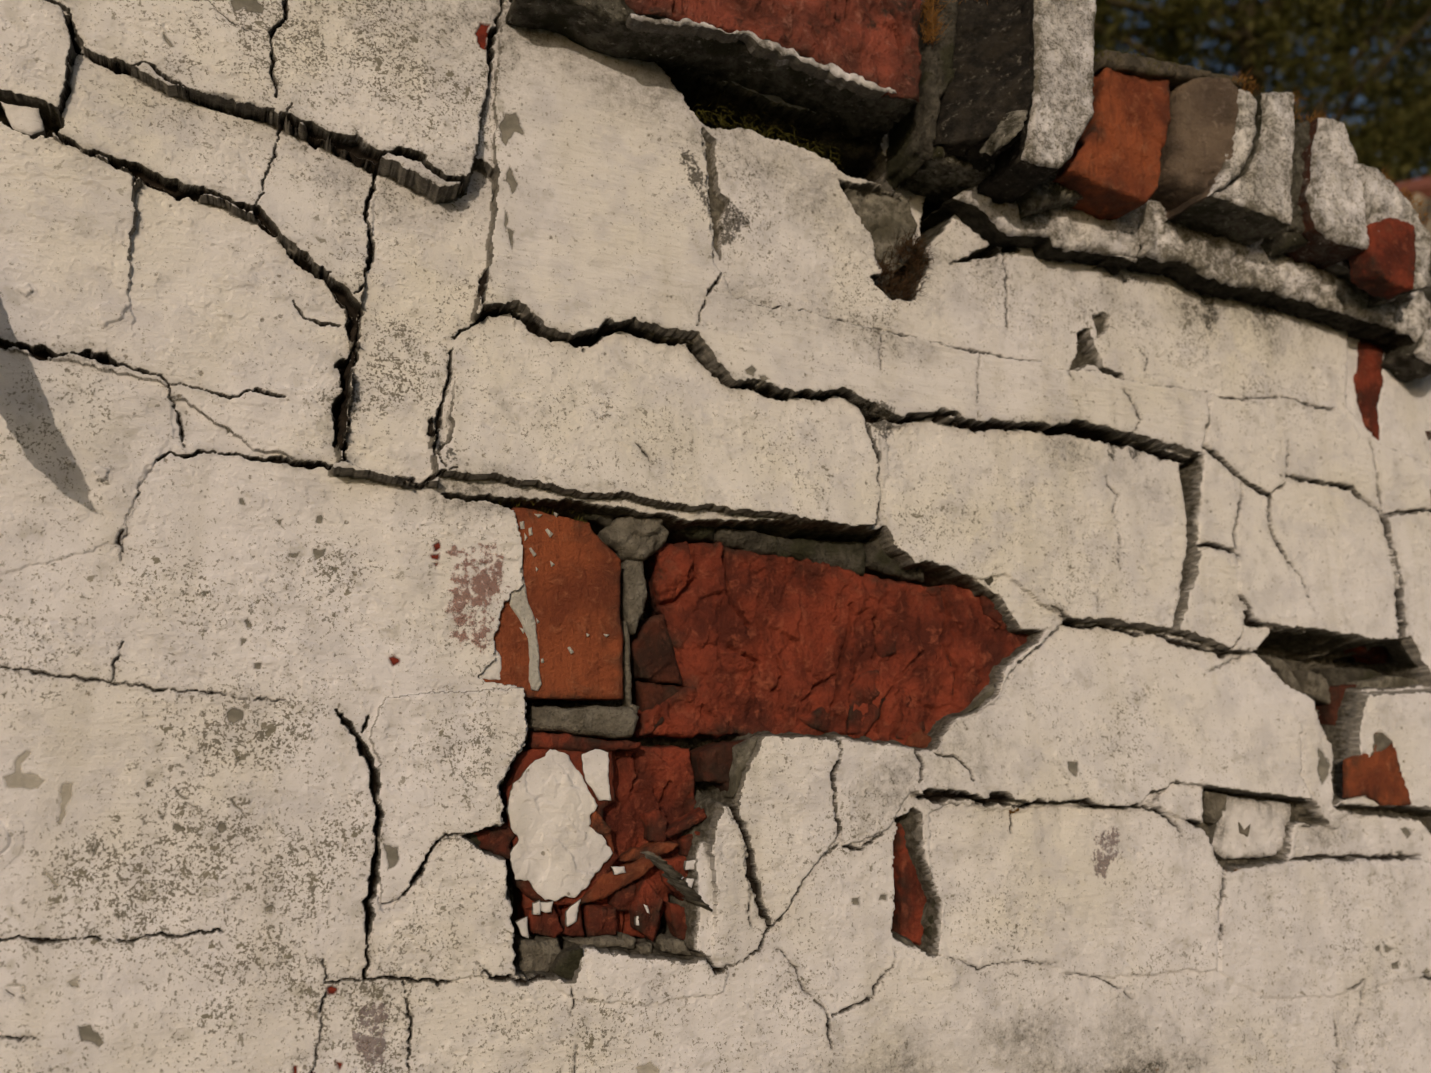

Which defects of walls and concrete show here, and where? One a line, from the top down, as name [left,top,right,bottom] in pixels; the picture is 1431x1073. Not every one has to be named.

spalling [1,102,46,140]
crack [0,0,1327,597]
spalling [1353,338,1384,440]
crack [1,642,276,702]
crack [1052,598,1258,668]
spalling [463,505,1028,980]
crack [914,753,1199,832]
spalling [1317,732,1411,806]
crack [0,928,220,942]
crack [311,711,449,1073]
crack [706,806,888,1044]
crack [1277,853,1409,862]